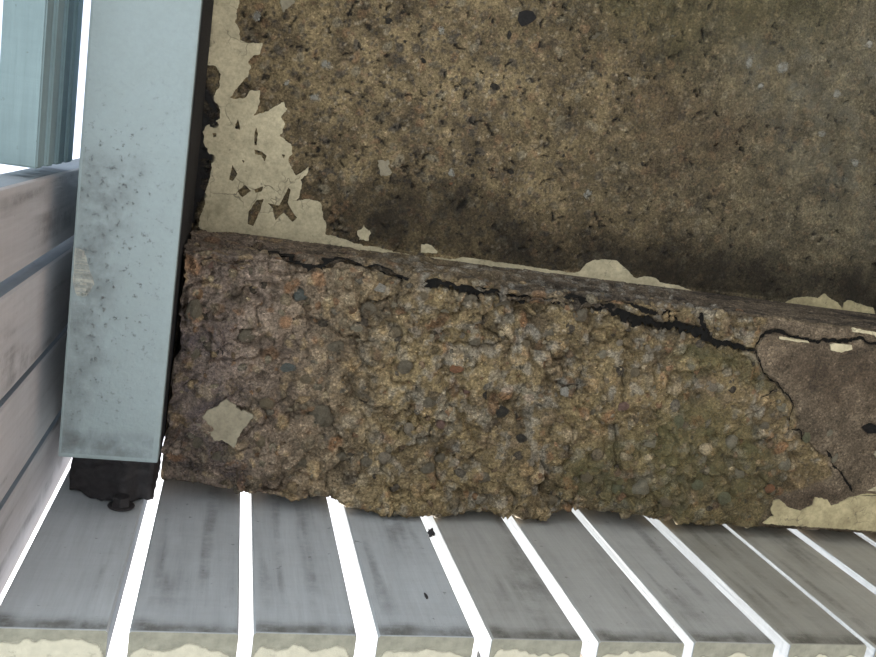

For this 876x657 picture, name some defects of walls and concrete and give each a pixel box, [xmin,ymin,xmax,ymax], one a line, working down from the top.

spalling [161,0,876,531]
crack [248,244,876,439]
crack [827,451,876,496]